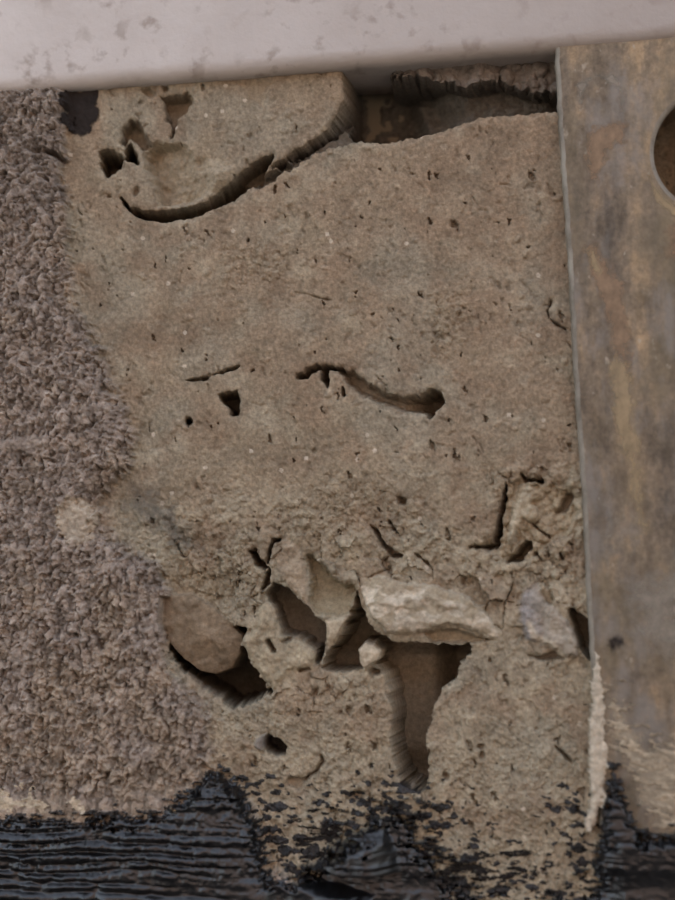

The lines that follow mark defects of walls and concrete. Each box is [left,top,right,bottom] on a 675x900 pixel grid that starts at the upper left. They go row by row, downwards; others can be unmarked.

spalling [254,74,557,189]
spalling [142,140,239,212]
crack [121,155,275,223]
crack [297,364,446,419]
rust [587,247,647,527]
spalling [469,473,580,566]
spalling [568,608,591,662]
spalling [169,645,274,710]
spalling [266,554,498,792]